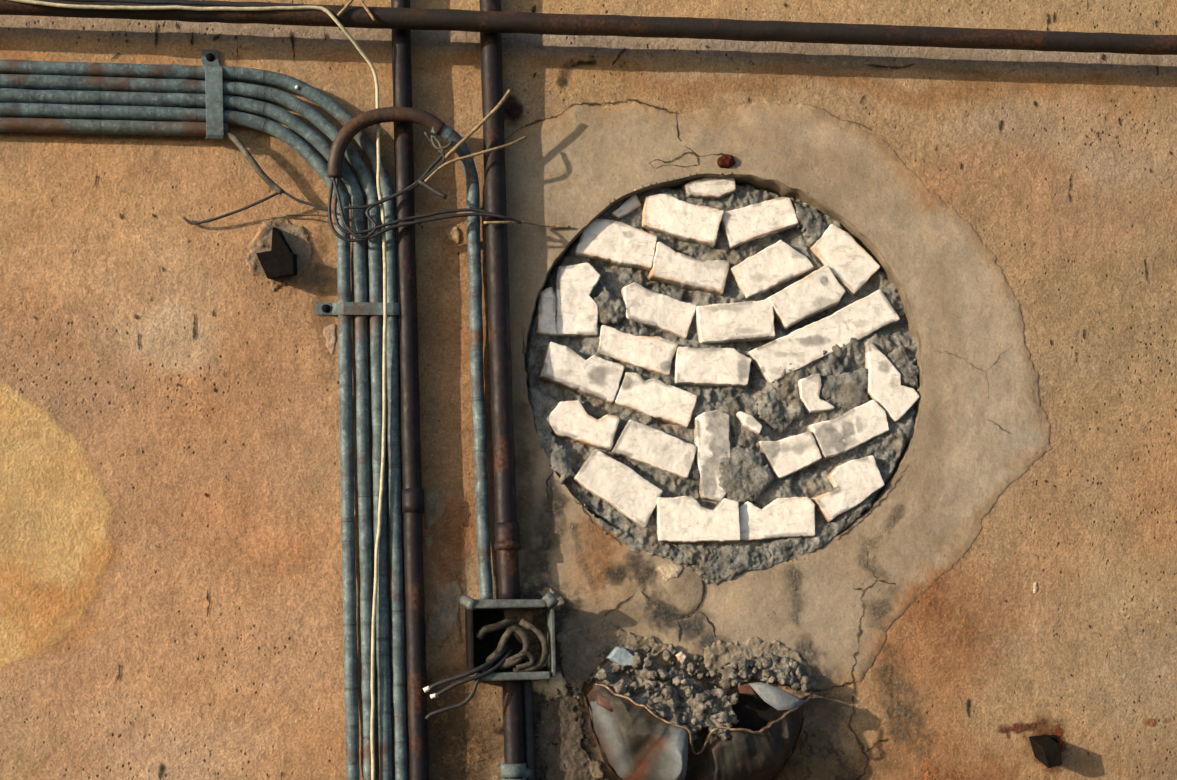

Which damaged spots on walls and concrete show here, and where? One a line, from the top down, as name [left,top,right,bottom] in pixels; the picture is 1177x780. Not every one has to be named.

crack [506,99,723,168]
damp [515,440,596,780]
flaking render [531,619,669,780]
damp [606,554,726,688]
flaking render [658,561,684,582]
flaking render [703,636,815,696]
damp [786,567,800,625]
damp [796,639,855,780]
crack [804,466,908,780]
corrosion [998,719,1067,752]